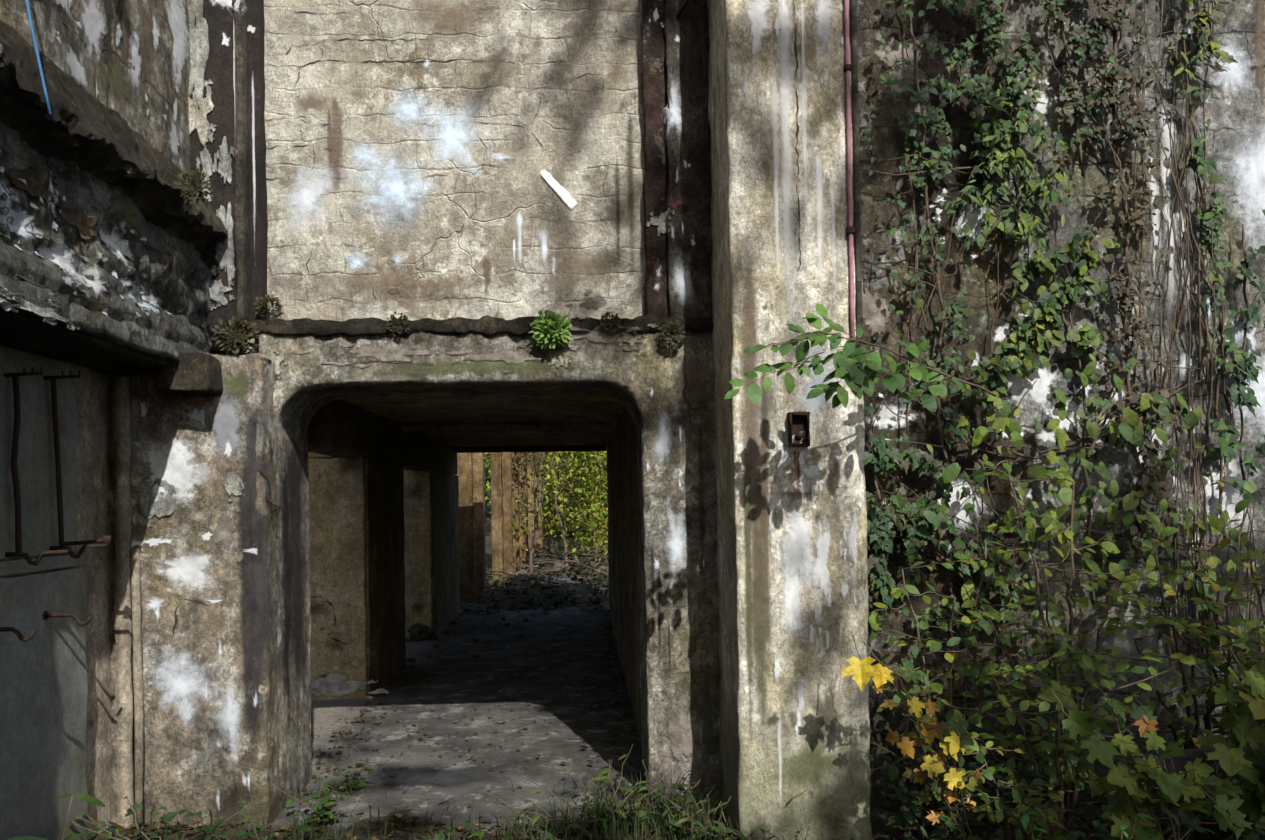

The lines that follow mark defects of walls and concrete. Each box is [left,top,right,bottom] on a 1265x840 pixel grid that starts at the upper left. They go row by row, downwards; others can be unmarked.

crack [265,1,516,85]
peeling [56,0,240,310]
crack [264,116,344,180]
water stain [301,95,341,184]
crack [417,100,543,155]
peeling [1237,134,1265,233]
peeling [0,166,170,319]
peeling [1227,322,1265,417]
peeling [131,438,207,547]
peeling [159,472,257,655]
rust [794,450,804,488]
peeling [769,427,861,649]